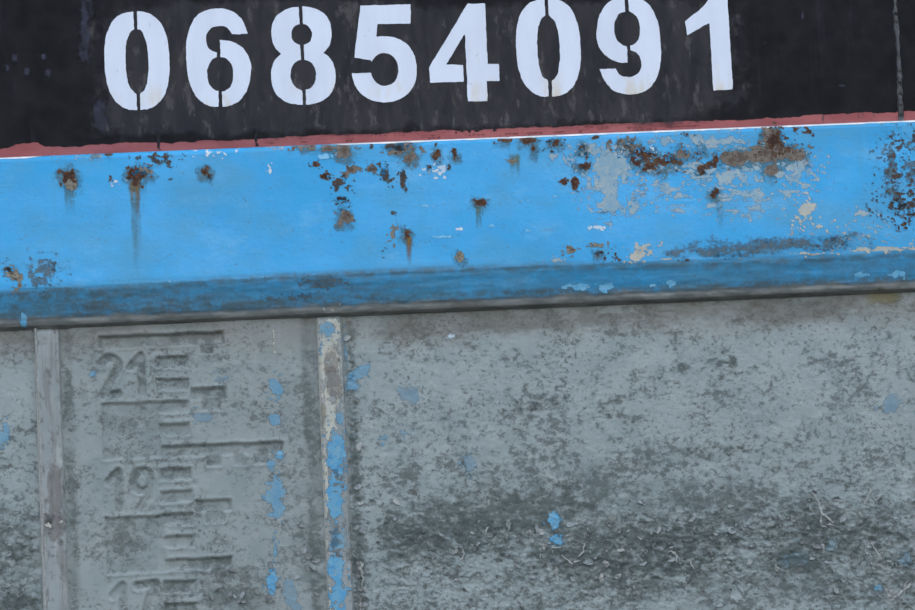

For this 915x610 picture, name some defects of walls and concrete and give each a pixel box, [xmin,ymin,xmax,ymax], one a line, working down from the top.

corrosion [56,166,80,191]
corrosion [111,148,239,200]
corrosion [288,141,460,231]
corrosion [493,135,566,164]
corrosion [558,122,814,192]
peeling [548,129,915,258]
corrosion [848,122,915,248]
corrosion [382,211,412,258]
peeling [551,241,690,264]
peeling [200,303,371,610]
peeling [393,489,915,610]